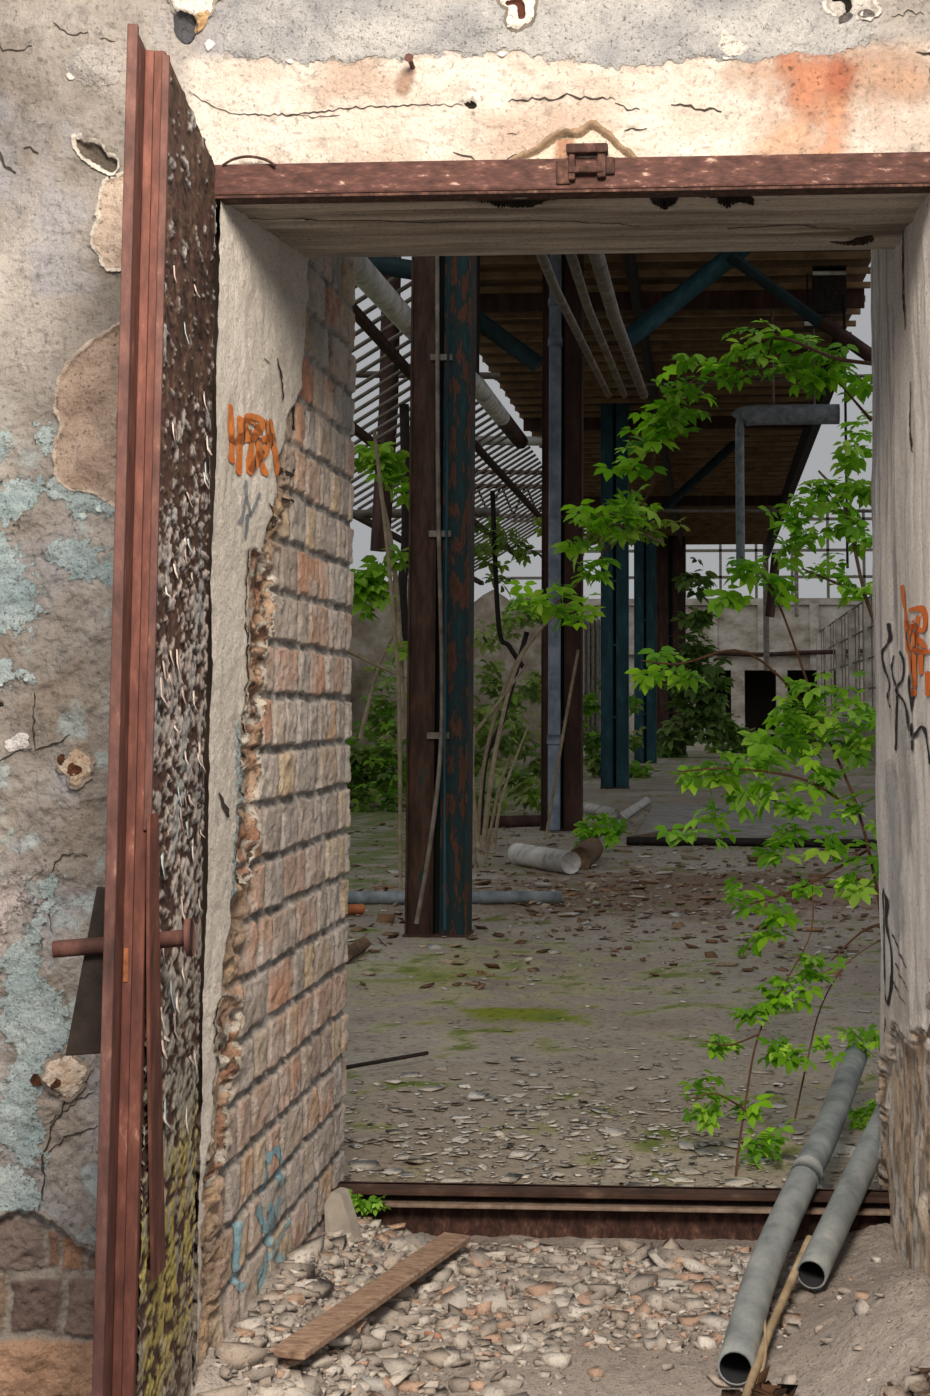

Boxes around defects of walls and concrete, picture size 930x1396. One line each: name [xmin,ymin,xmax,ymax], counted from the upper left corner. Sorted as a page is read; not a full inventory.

peeling [167,0,882,70]
crack [189,91,464,118]
rust [741,54,924,155]
spalling [71,133,124,272]
spalling [0,321,120,641]
peeling [5,732,29,752]
peeling [0,658,36,707]
spalling [55,744,96,789]
spalling [229,547,278,898]
spalling [0,868,96,1396]
crack [38,1091,98,1211]